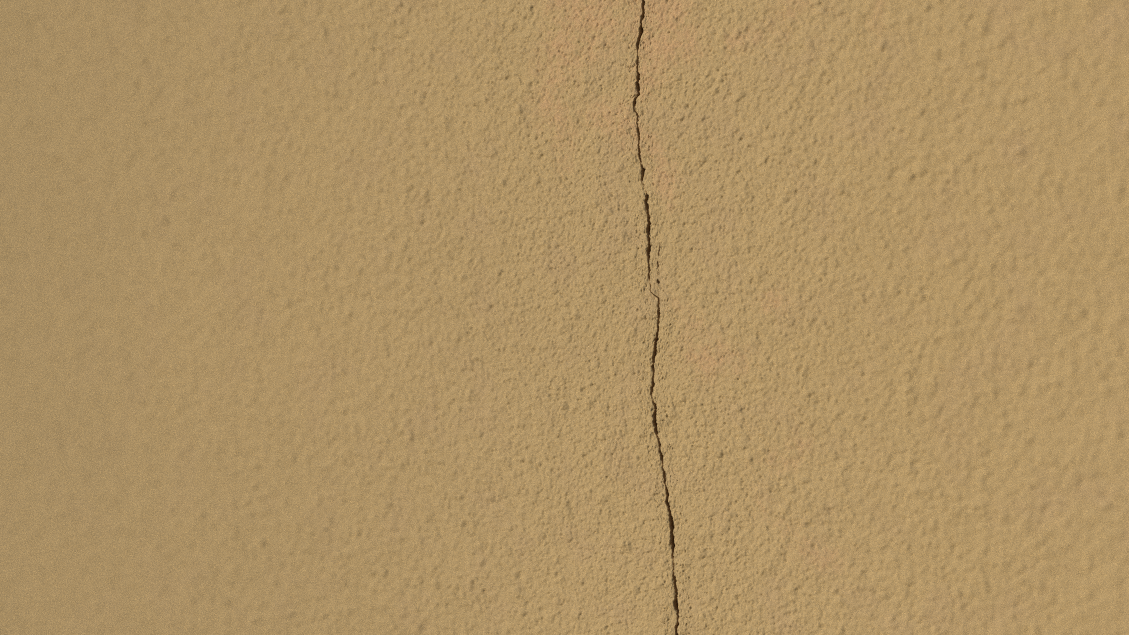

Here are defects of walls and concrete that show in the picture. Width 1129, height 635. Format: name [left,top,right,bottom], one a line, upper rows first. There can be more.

crack [632,0,679,635]